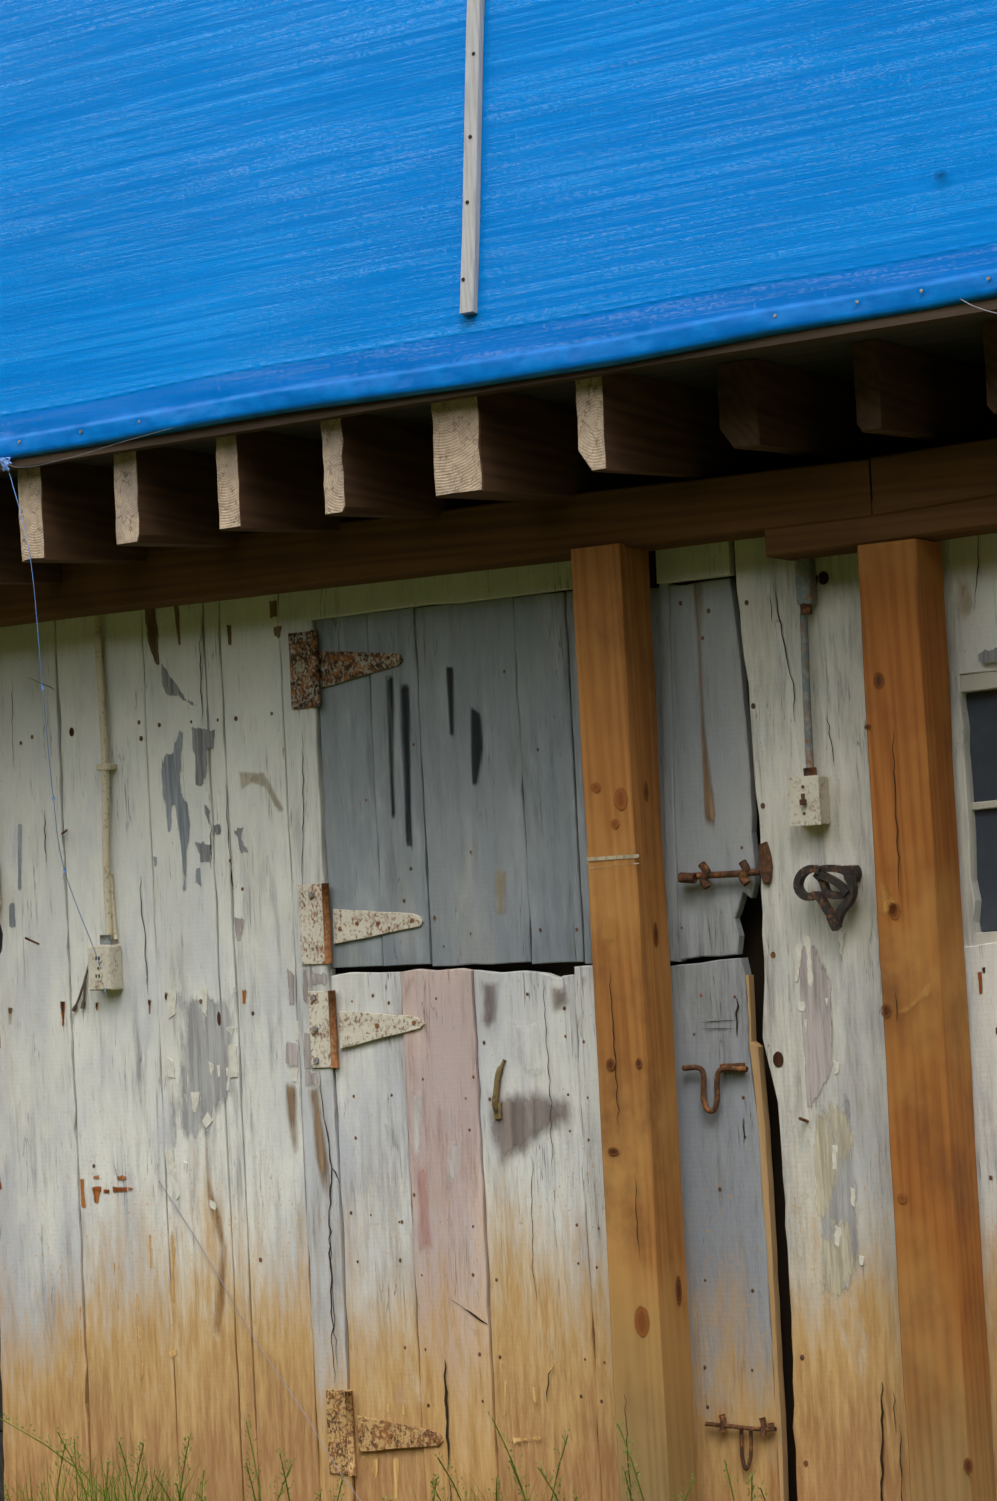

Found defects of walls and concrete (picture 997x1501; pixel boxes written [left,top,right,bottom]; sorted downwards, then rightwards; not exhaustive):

crack [709,998,739,1034]